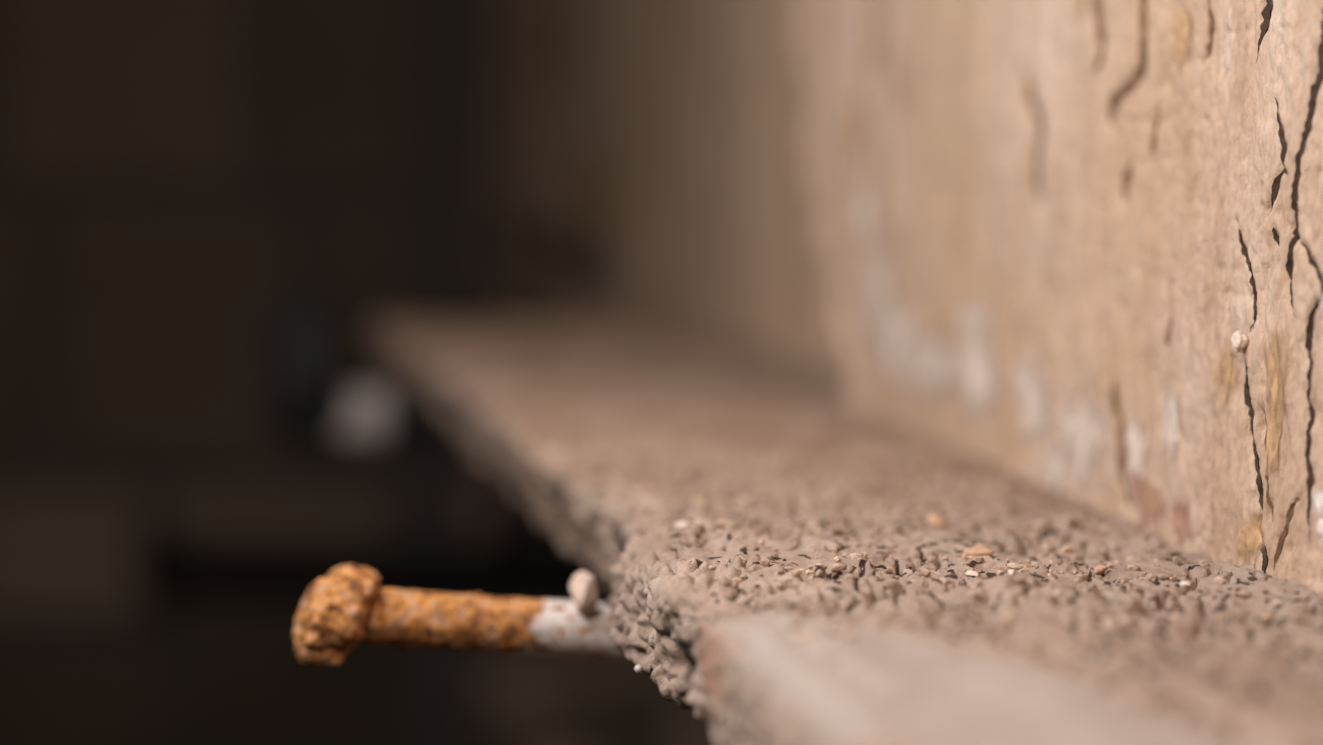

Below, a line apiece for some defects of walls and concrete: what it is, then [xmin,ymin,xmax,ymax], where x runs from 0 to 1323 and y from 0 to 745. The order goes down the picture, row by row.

crack [1091,0,1161,200]
crack [1165,280,1173,346]
crack [1236,0,1323,573]